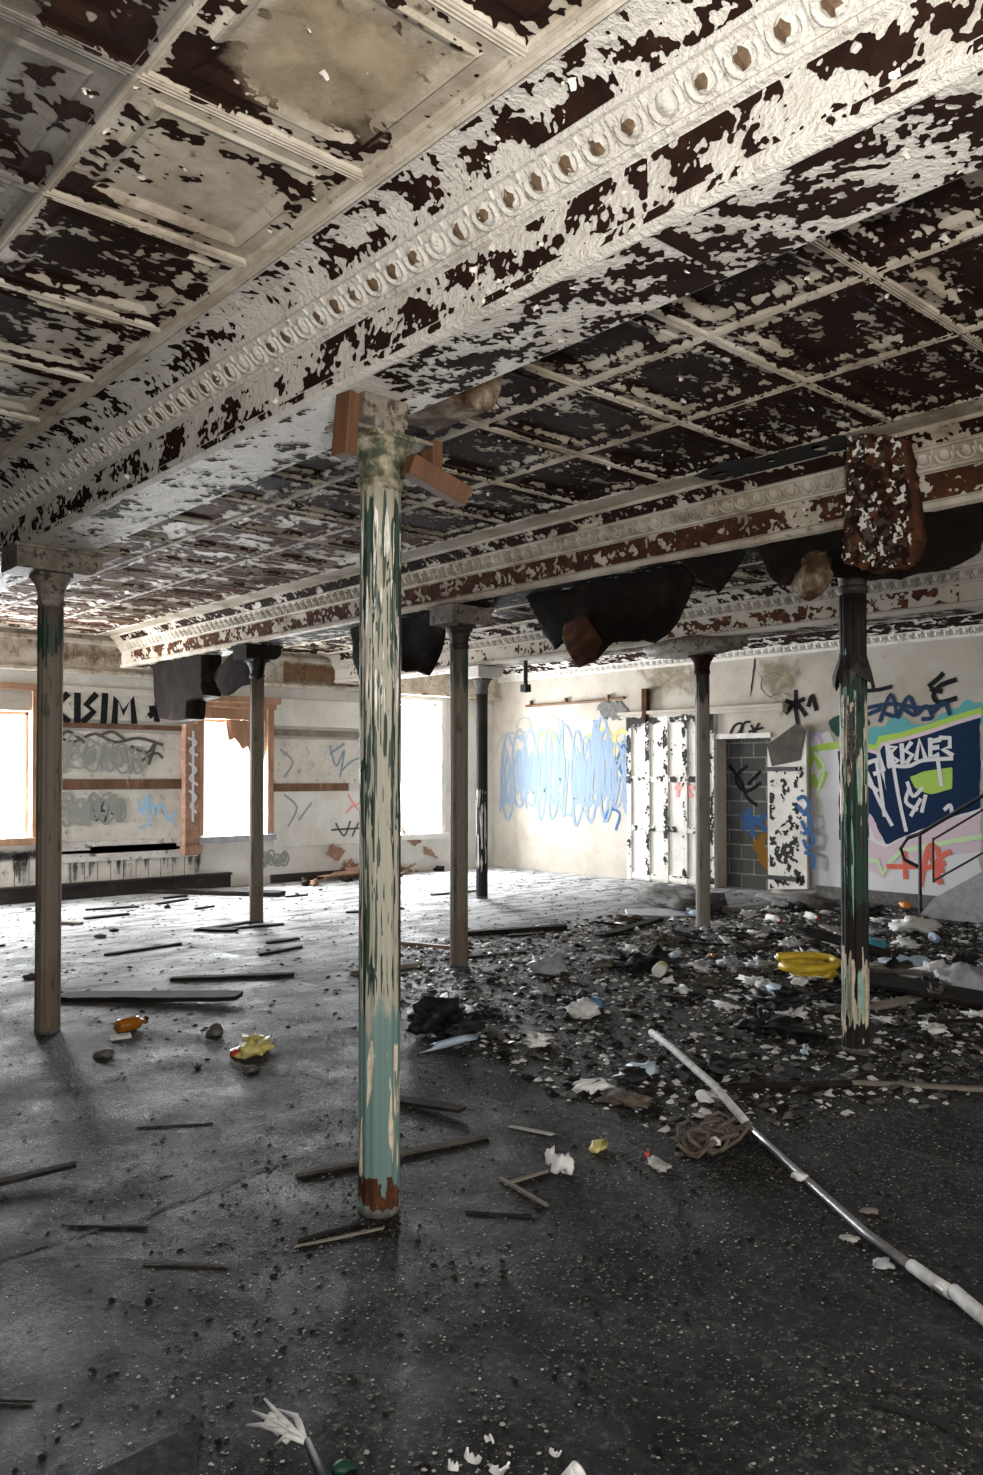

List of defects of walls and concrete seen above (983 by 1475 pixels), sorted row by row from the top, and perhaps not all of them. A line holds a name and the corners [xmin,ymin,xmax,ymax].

water stain [232,0,422,126]
peeling [703,945,983,1084]
peeling [67,974,983,1416]
peeling [53,1364,159,1469]
peeling [626,1332,983,1475]